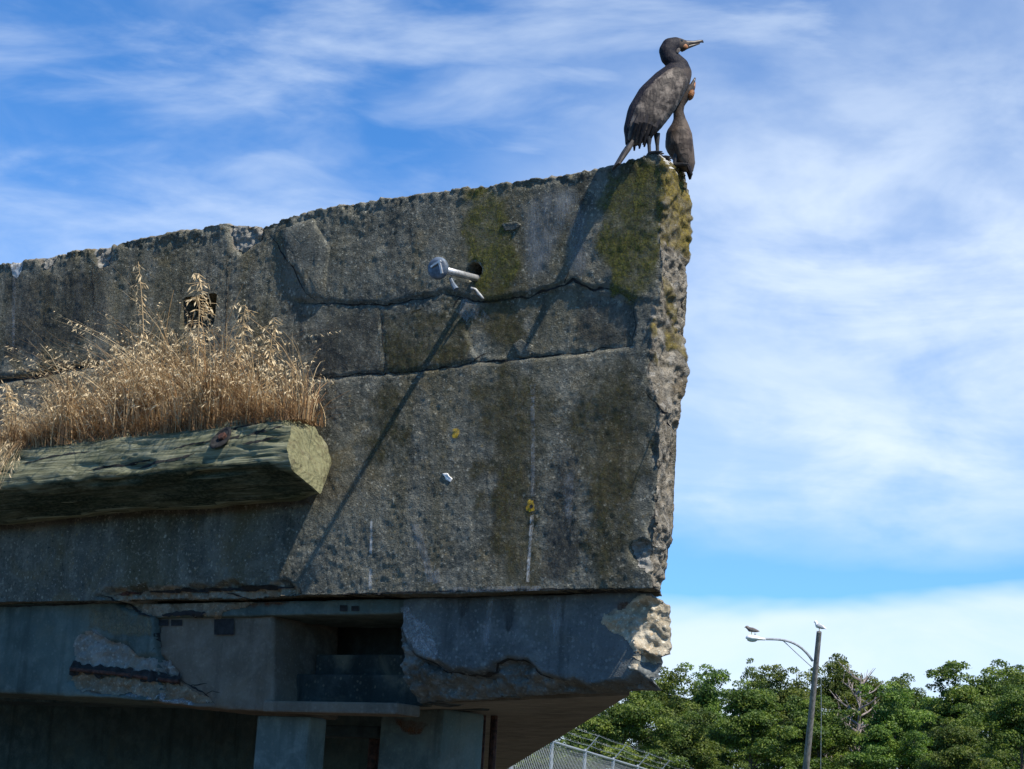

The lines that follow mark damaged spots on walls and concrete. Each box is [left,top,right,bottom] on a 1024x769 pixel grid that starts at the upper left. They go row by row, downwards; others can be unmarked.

spalling [69,631,212,705]
spalling [400,594,672,703]